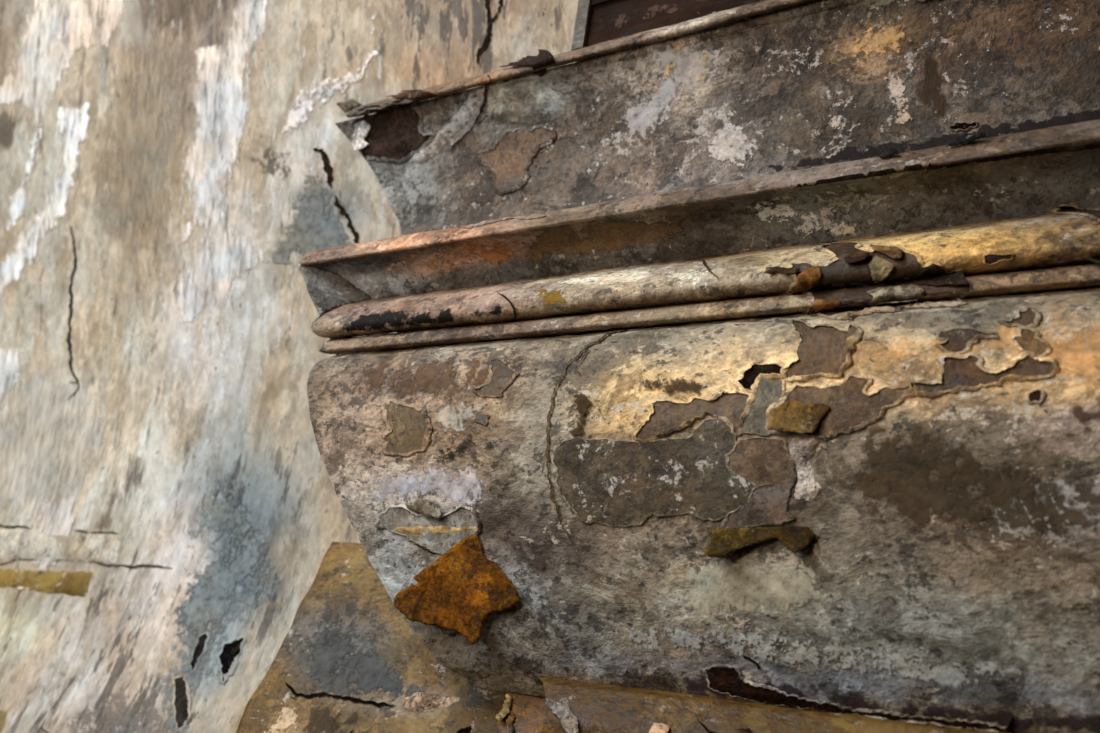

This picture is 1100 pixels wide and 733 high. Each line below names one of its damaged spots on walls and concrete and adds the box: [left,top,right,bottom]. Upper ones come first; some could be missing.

water stain [0,0,125,299]
water stain [94,0,352,322]
water stain [282,47,379,134]
spalling [336,89,437,165]
crack [448,0,502,152]
peeling [1051,202,1100,238]
water stain [0,348,143,536]
crack [66,225,79,400]
peeling [551,242,1061,558]
crack [1006,717,1019,733]